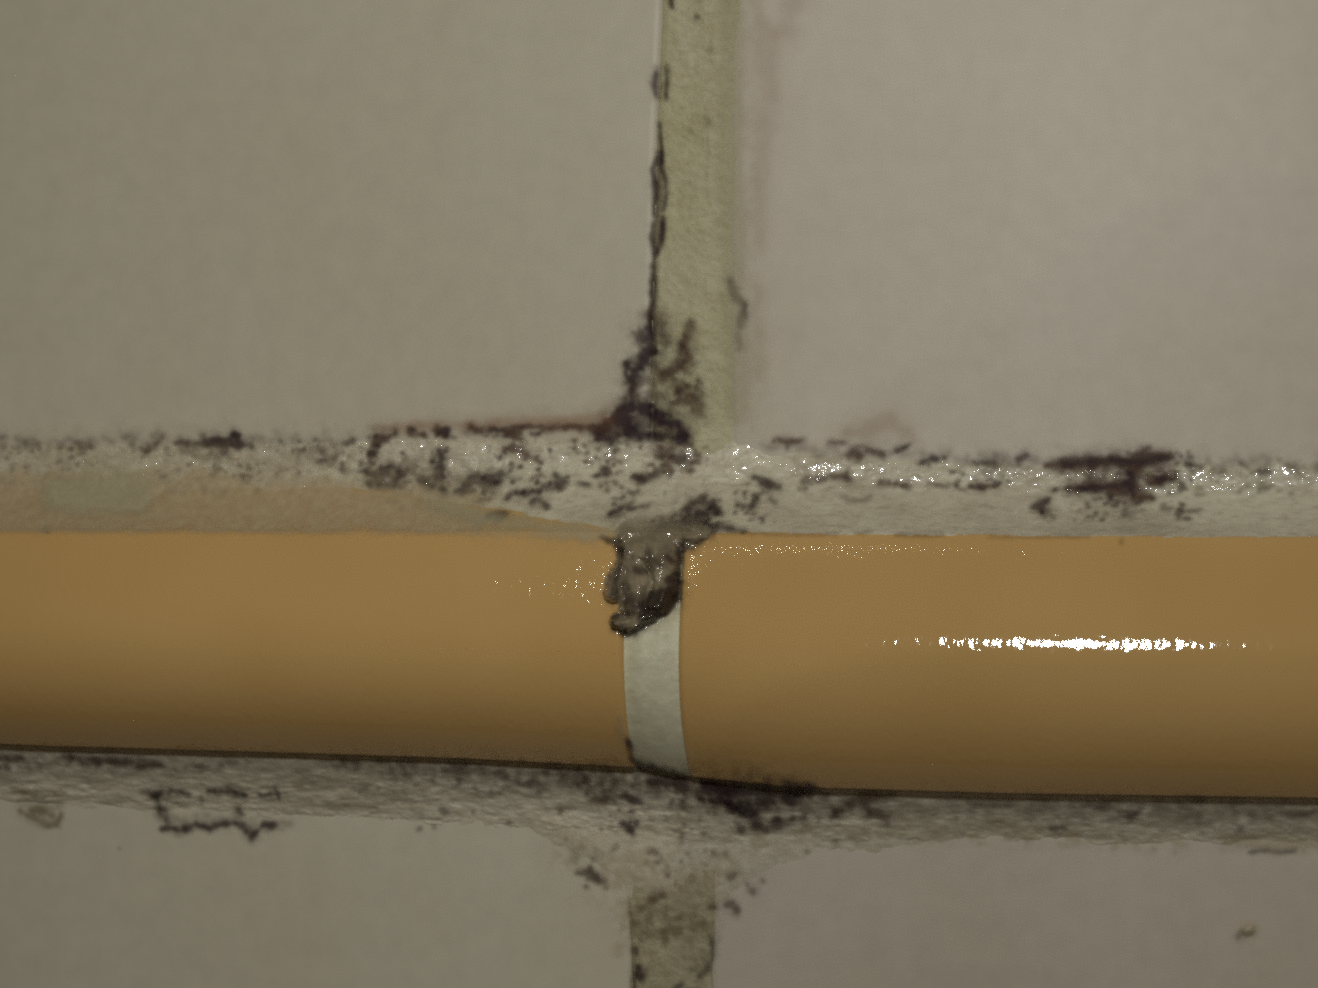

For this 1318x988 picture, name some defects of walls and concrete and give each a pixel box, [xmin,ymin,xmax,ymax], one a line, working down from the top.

water stain [650,134,666,253]
water stain [176,431,244,447]
water stain [737,476,780,510]
water stain [1032,447,1185,513]
water stain [601,495,745,636]
water stain [151,788,276,839]
water stain [627,740,816,831]